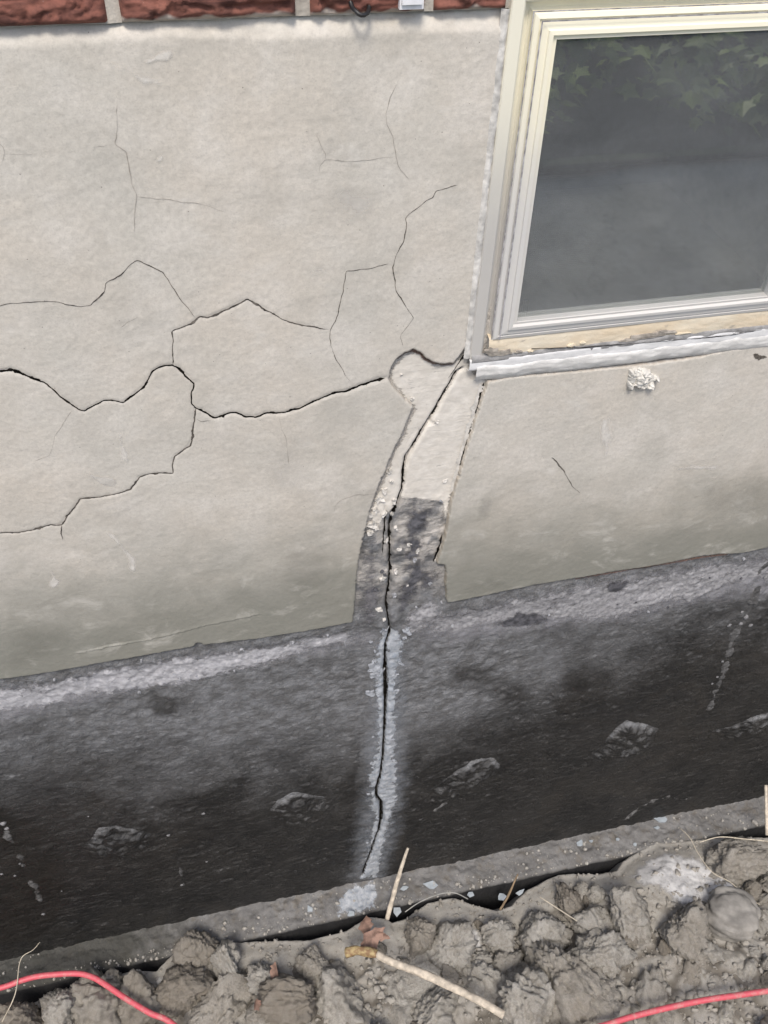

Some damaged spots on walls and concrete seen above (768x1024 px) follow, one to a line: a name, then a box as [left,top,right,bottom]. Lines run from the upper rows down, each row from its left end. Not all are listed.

crack [97,108,224,230]
crack [318,88,408,178]
water stain [0,634,355,719]
crack [0,185,456,539]
crack [334,354,485,874]
spalling [361,353,485,624]
water stain [337,557,768,917]